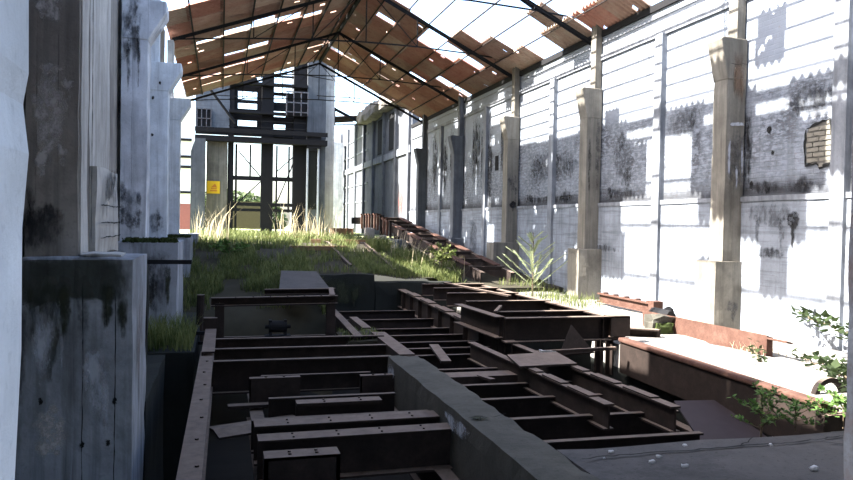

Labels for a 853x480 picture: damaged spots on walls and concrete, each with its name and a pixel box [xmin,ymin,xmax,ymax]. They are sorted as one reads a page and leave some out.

damp [118,3,140,119]
damp [794,85,831,116]
damp [463,126,504,206]
damp [743,118,751,178]
flaking render [803,118,831,170]
damp [23,190,61,246]
damp [106,173,140,226]
damp [755,210,799,247]
damp [148,258,171,304]
damp [19,286,79,390]
damp [103,287,127,336]